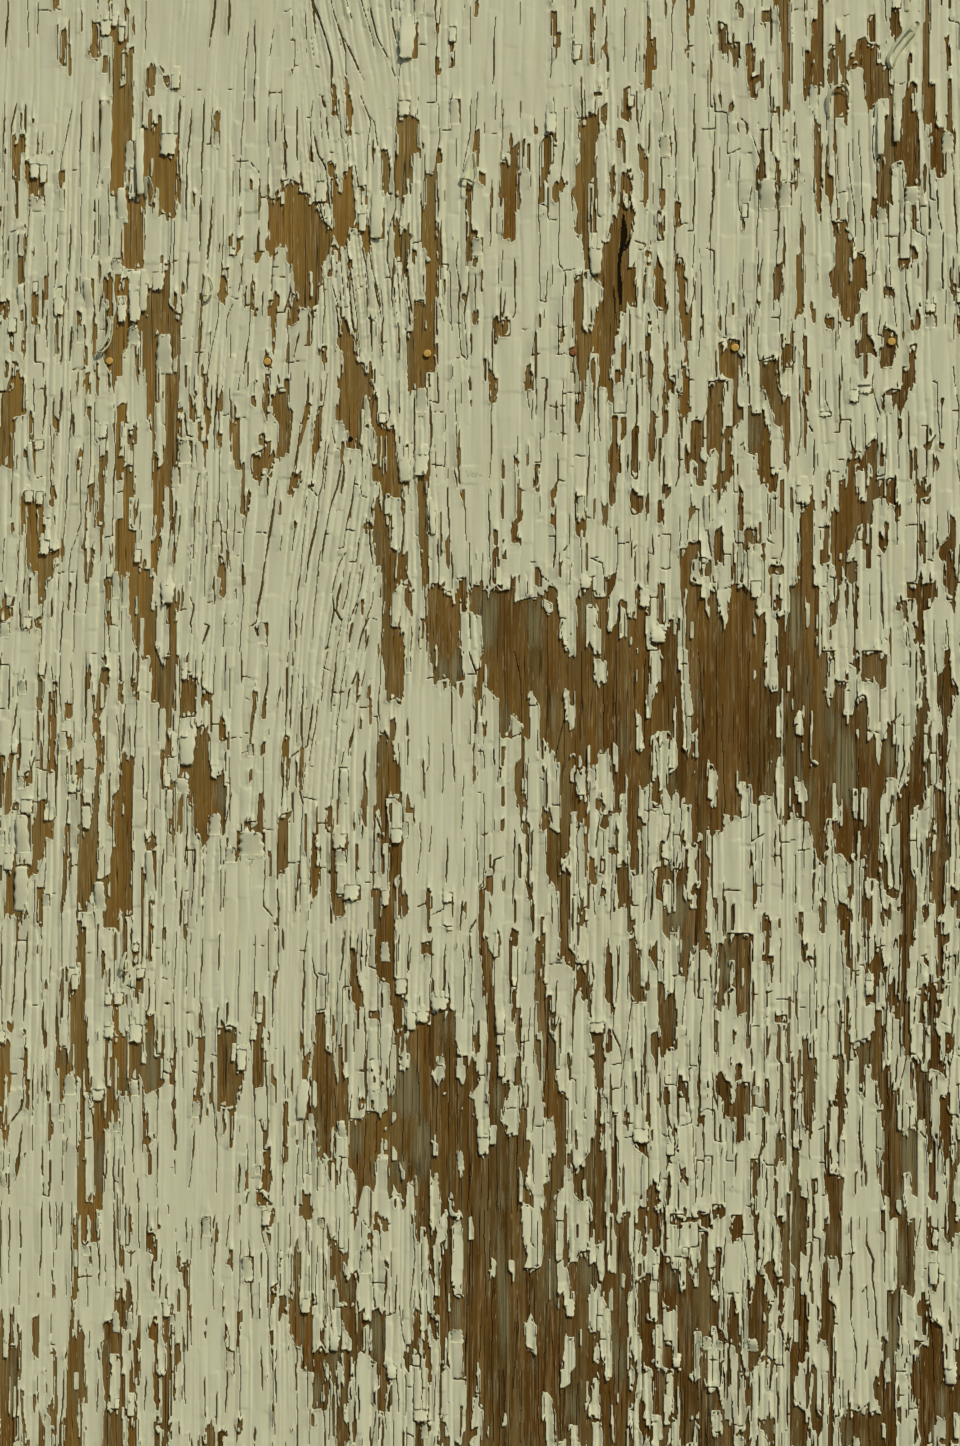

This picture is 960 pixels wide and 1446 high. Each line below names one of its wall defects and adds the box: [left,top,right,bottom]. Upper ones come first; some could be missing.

crack [5,0,39,48]
crack [97,0,147,50]
peeling [460,0,668,441]
peeling [717,0,805,213]
peeling [802,0,956,403]
peeling [0,0,446,1263]
peeling [187,210,960,1446]
peeling [0,1160,243,1446]
crack [0,932,595,1446]
crack [596,1300,652,1446]
crack [633,1216,642,1271]
crack [722,1160,774,1349]